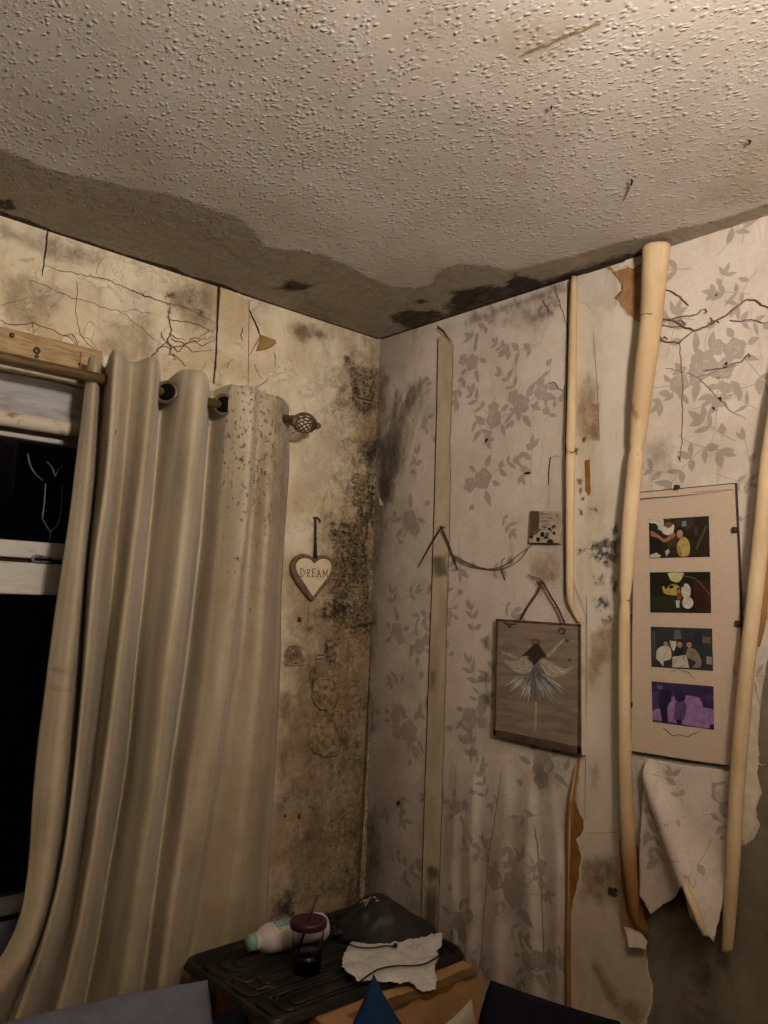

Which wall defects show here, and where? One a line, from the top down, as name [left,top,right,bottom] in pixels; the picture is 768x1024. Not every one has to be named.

crack [0,231,215,349]
peeling [213,287,276,386]
damp [345,357,380,413]
damp [0,150,768,339]
damp [322,416,403,634]
damp [579,525,620,591]
peeling [571,255,768,1024]